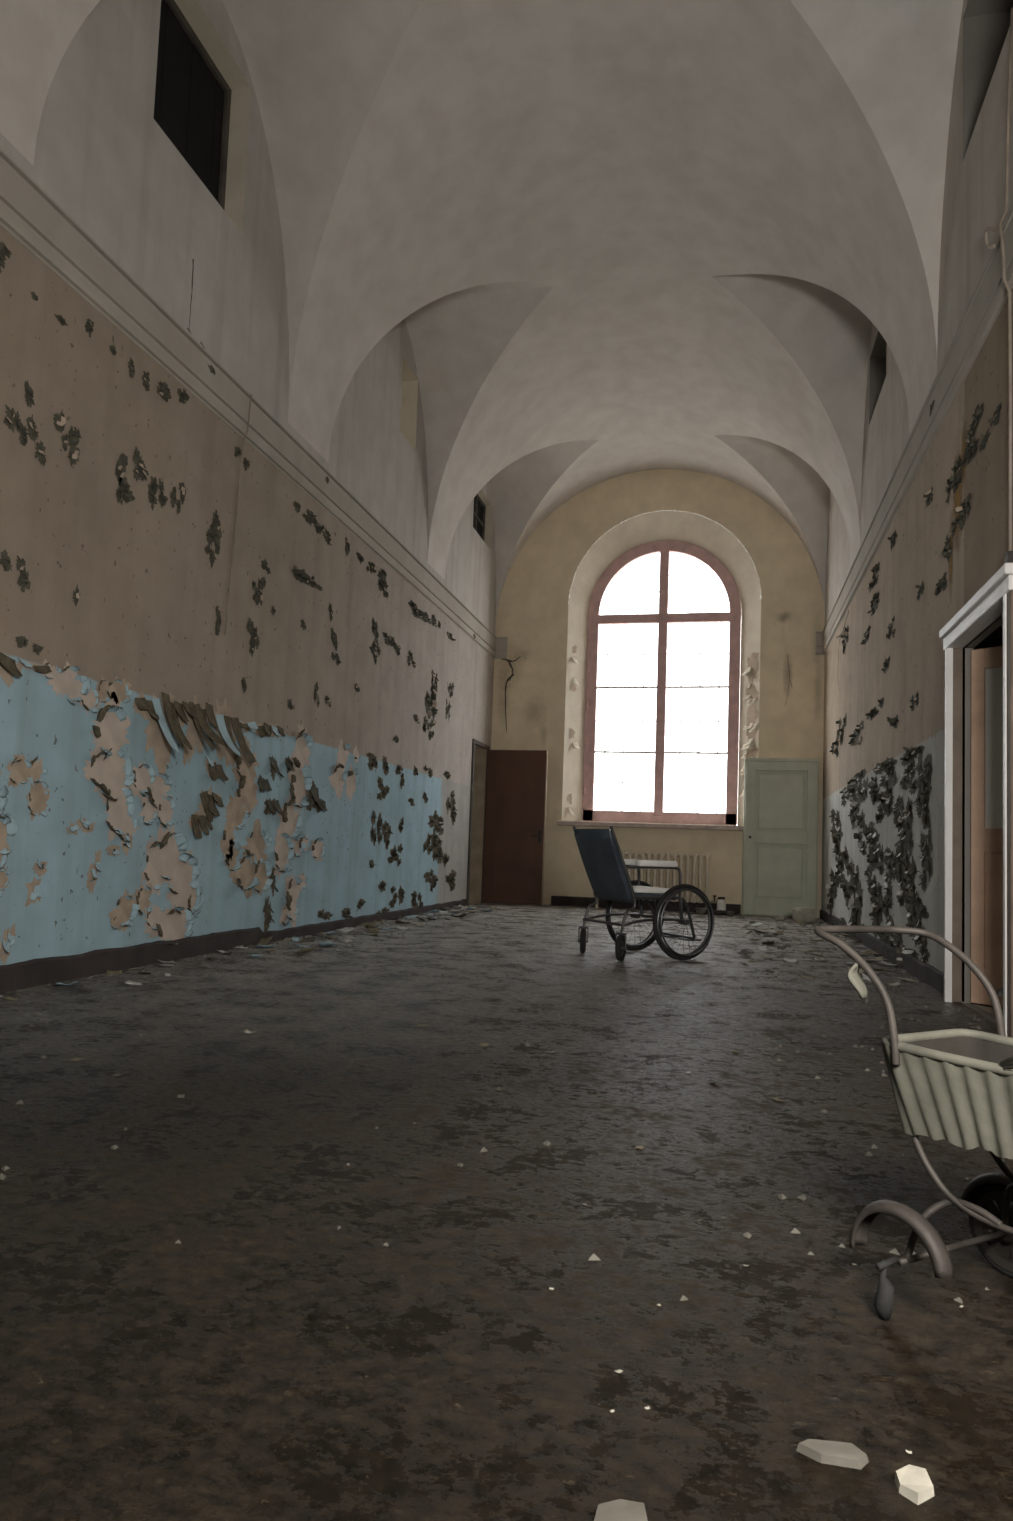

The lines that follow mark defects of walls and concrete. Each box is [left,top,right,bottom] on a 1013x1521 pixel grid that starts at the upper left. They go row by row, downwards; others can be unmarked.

peeling [3,380,82,466]
peeling [109,345,190,404]
peeling [115,447,186,514]
peeling [293,501,389,599]
peeling [915,402,1002,601]
peeling [247,559,276,657]
peeling [292,566,341,666]
peeling [408,600,476,641]
peeling [840,530,898,673]
peeling [829,690,919,758]
peeling [0,618,458,945]
peeling [826,745,933,964]